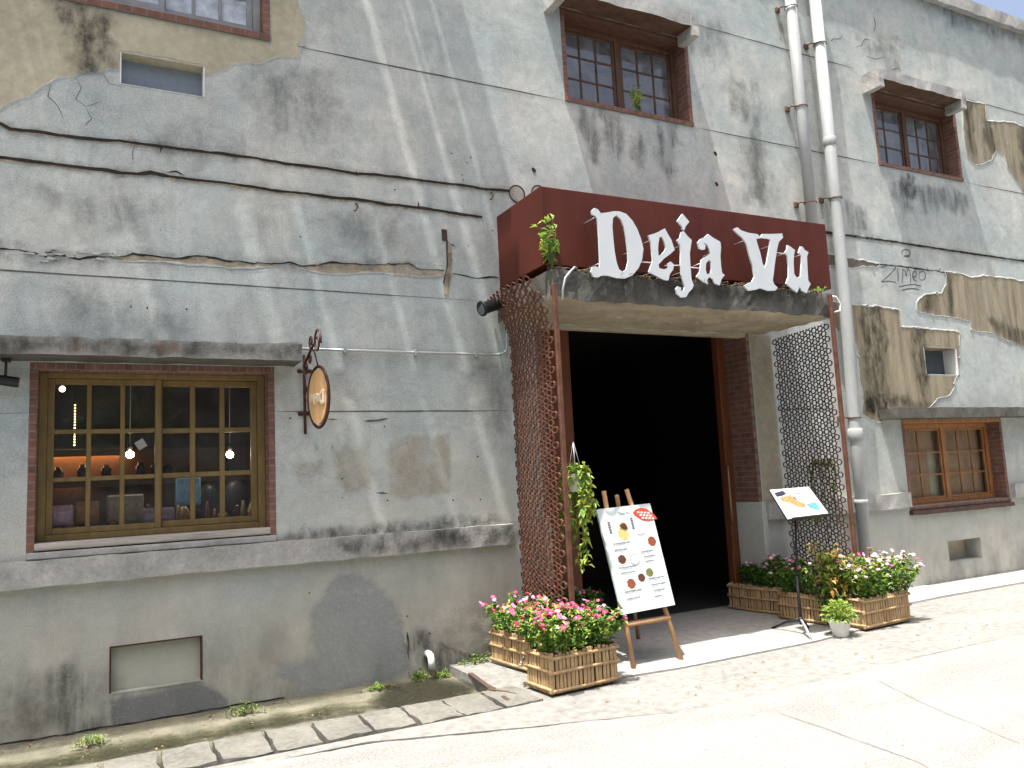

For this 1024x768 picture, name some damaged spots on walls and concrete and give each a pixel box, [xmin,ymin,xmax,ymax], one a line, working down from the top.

damp [80,18,108,72]
peeling [0,0,308,113]
crack [0,74,509,295]
peeling [962,99,1024,194]
peeling [833,271,1024,424]